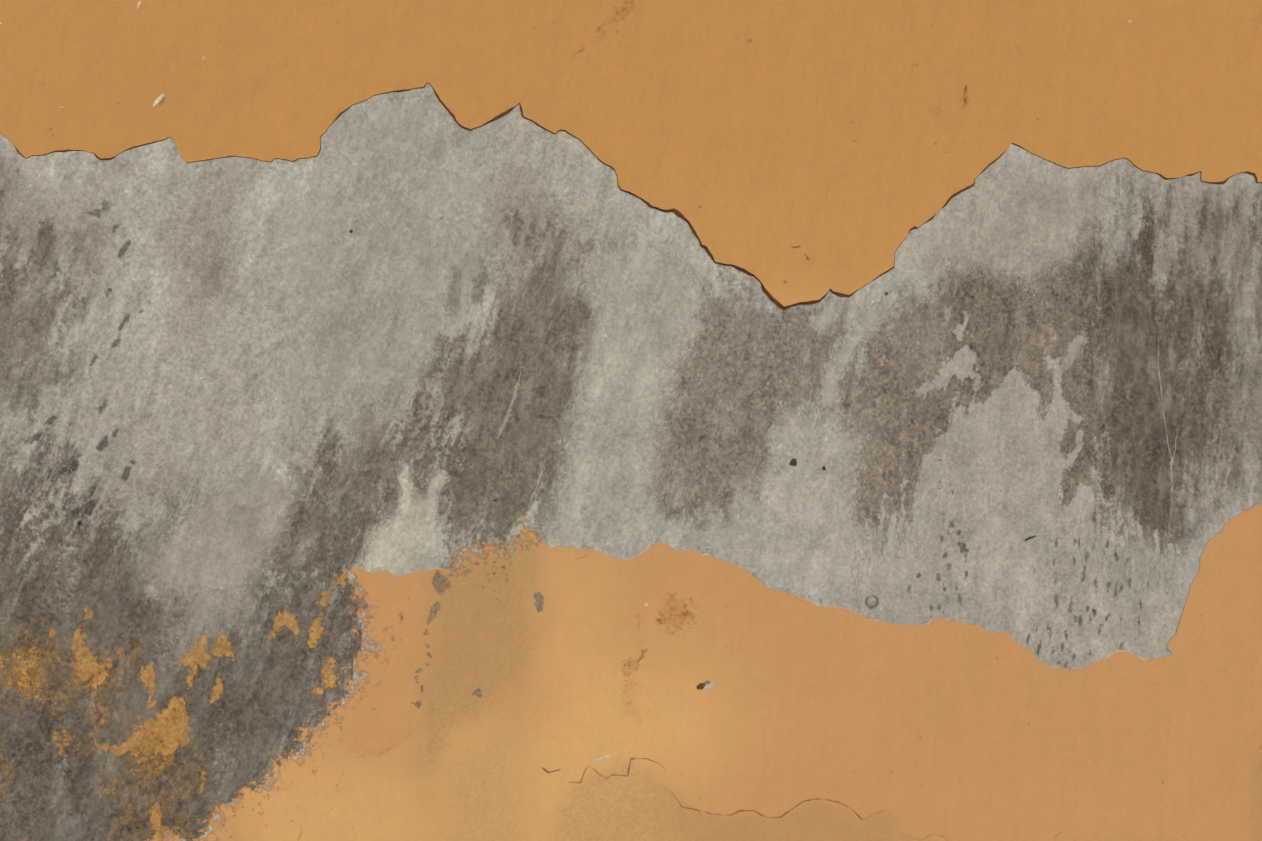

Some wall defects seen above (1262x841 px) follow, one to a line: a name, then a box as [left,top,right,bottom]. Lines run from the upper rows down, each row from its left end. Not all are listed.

leakage [0,222,594,841]
peeling [0,83,1262,736]
leakage [652,265,847,538]
leakage [841,233,1245,543]
peeling [55,678,224,841]